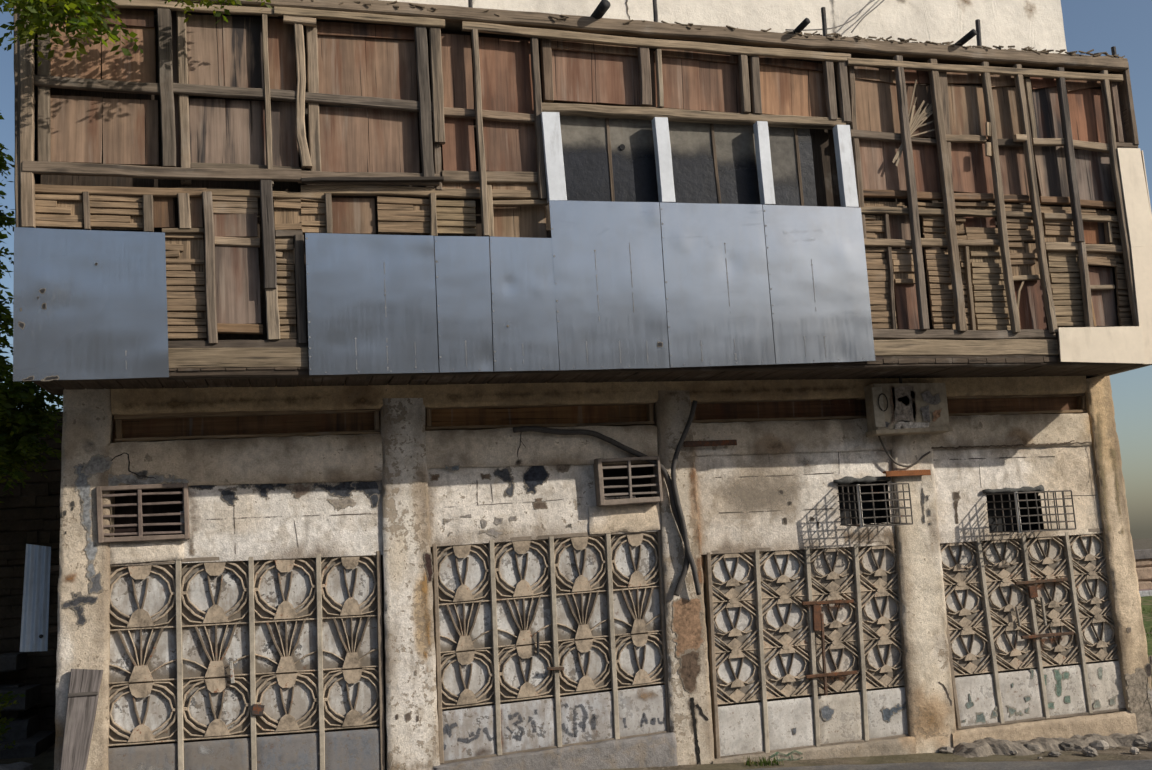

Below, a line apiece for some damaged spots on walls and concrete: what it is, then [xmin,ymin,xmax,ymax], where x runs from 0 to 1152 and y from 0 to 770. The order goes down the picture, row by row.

peeling [62,454,382,594]
peeling [480,465,571,510]
spalling [671,597,705,693]
peeling [962,693,1031,723]
peeling [1030,668,1071,709]
spalling [1093,656,1152,733]